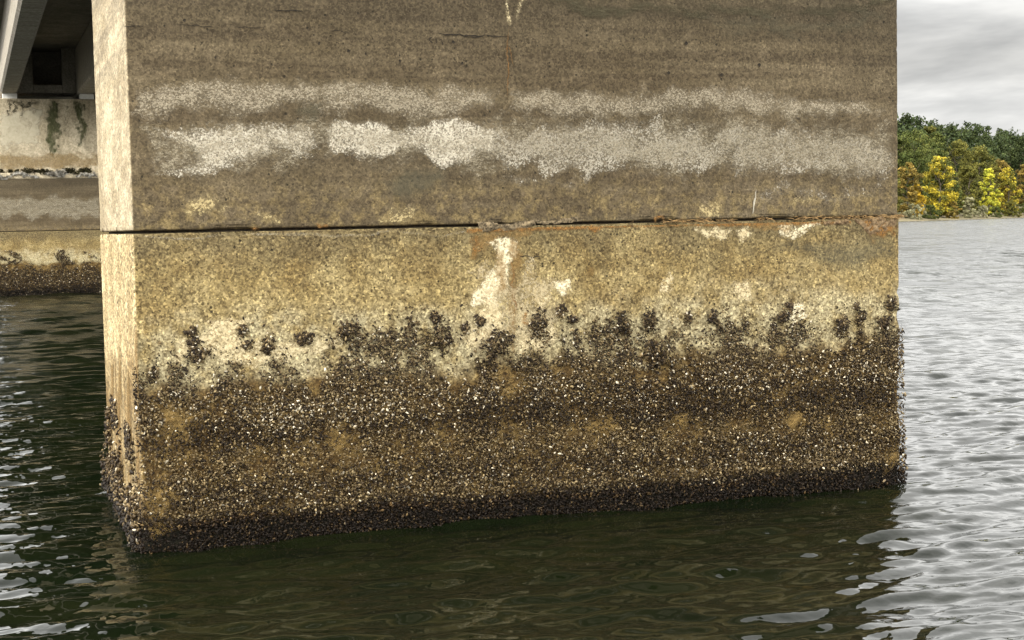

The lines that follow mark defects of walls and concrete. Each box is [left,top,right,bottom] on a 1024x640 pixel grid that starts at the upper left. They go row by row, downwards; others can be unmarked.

water stain [0,100,43,150]
water stain [138,83,869,177]
water stain [461,238,570,354]
corrosion [467,216,833,349]